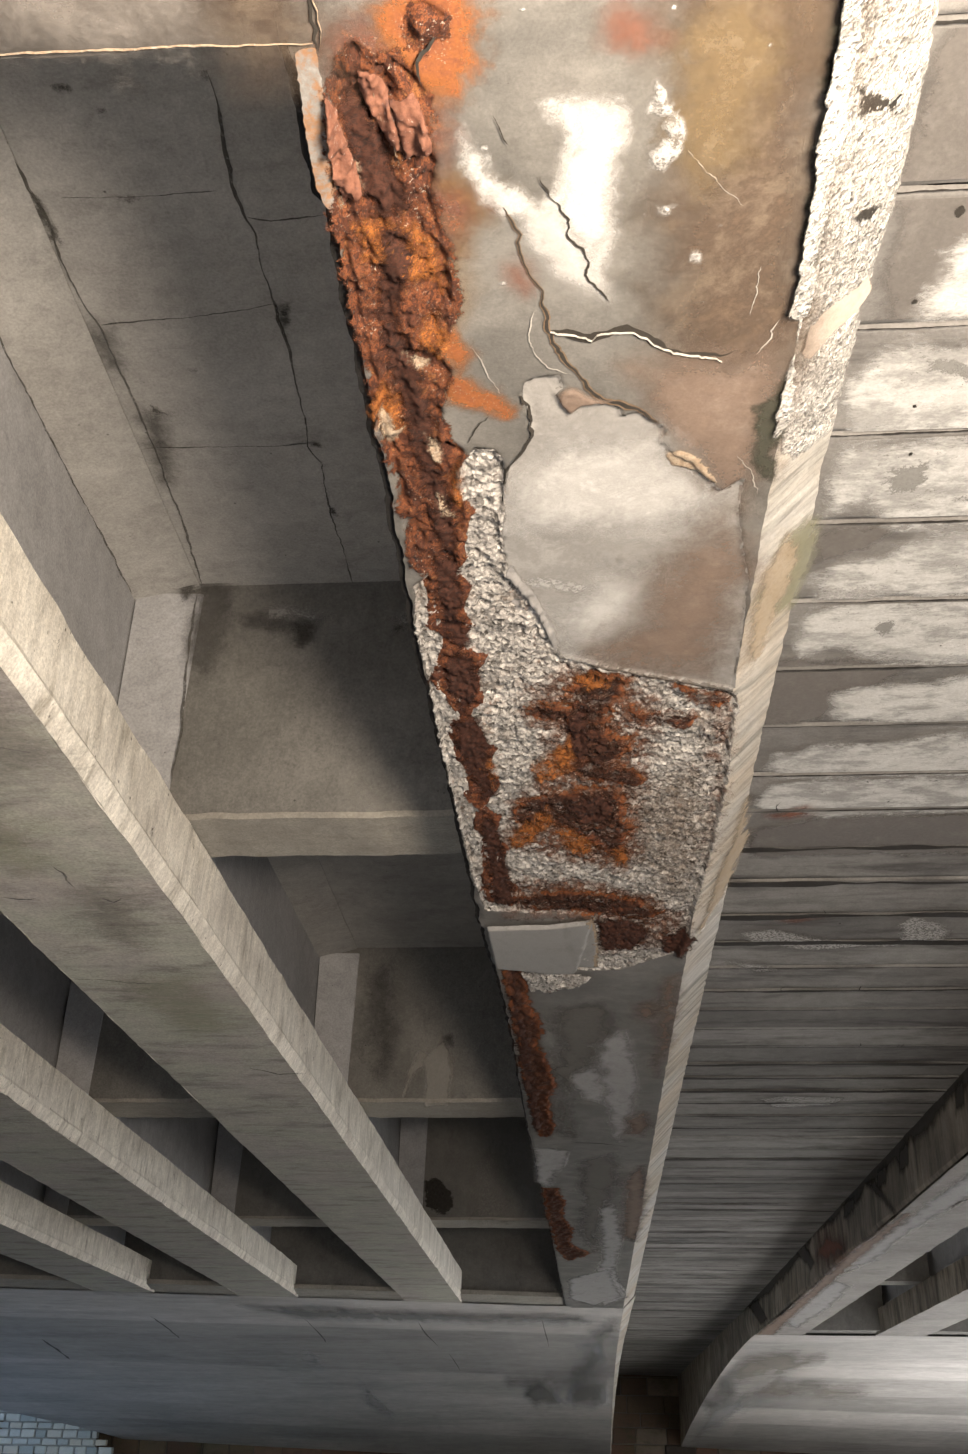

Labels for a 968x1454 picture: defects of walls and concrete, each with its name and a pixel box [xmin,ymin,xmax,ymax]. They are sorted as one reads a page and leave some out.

rust [322,0,480,236]
damp [458,97,629,292]
crack [503,180,781,422]
spalling [774,0,940,459]
crack [0,70,352,783]
crack [468,346,534,501]
spalling [318,41,753,1137]